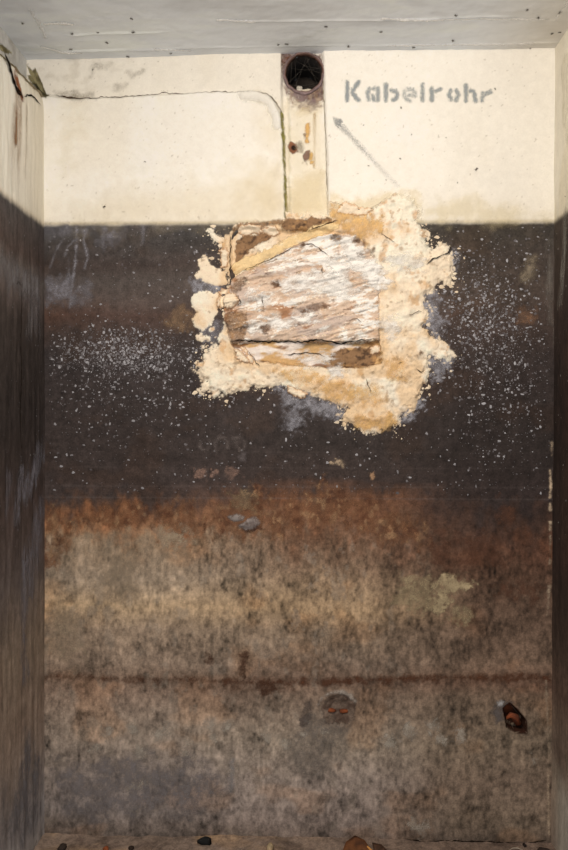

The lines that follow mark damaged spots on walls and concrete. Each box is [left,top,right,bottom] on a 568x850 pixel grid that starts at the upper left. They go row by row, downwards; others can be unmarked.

crack [4,53,238,104]
corrosion [285,83,323,108]
corrosion [288,123,313,164]
spalling [190,193,465,440]
corrosion [210,479,425,552]
spalling [493,700,528,734]